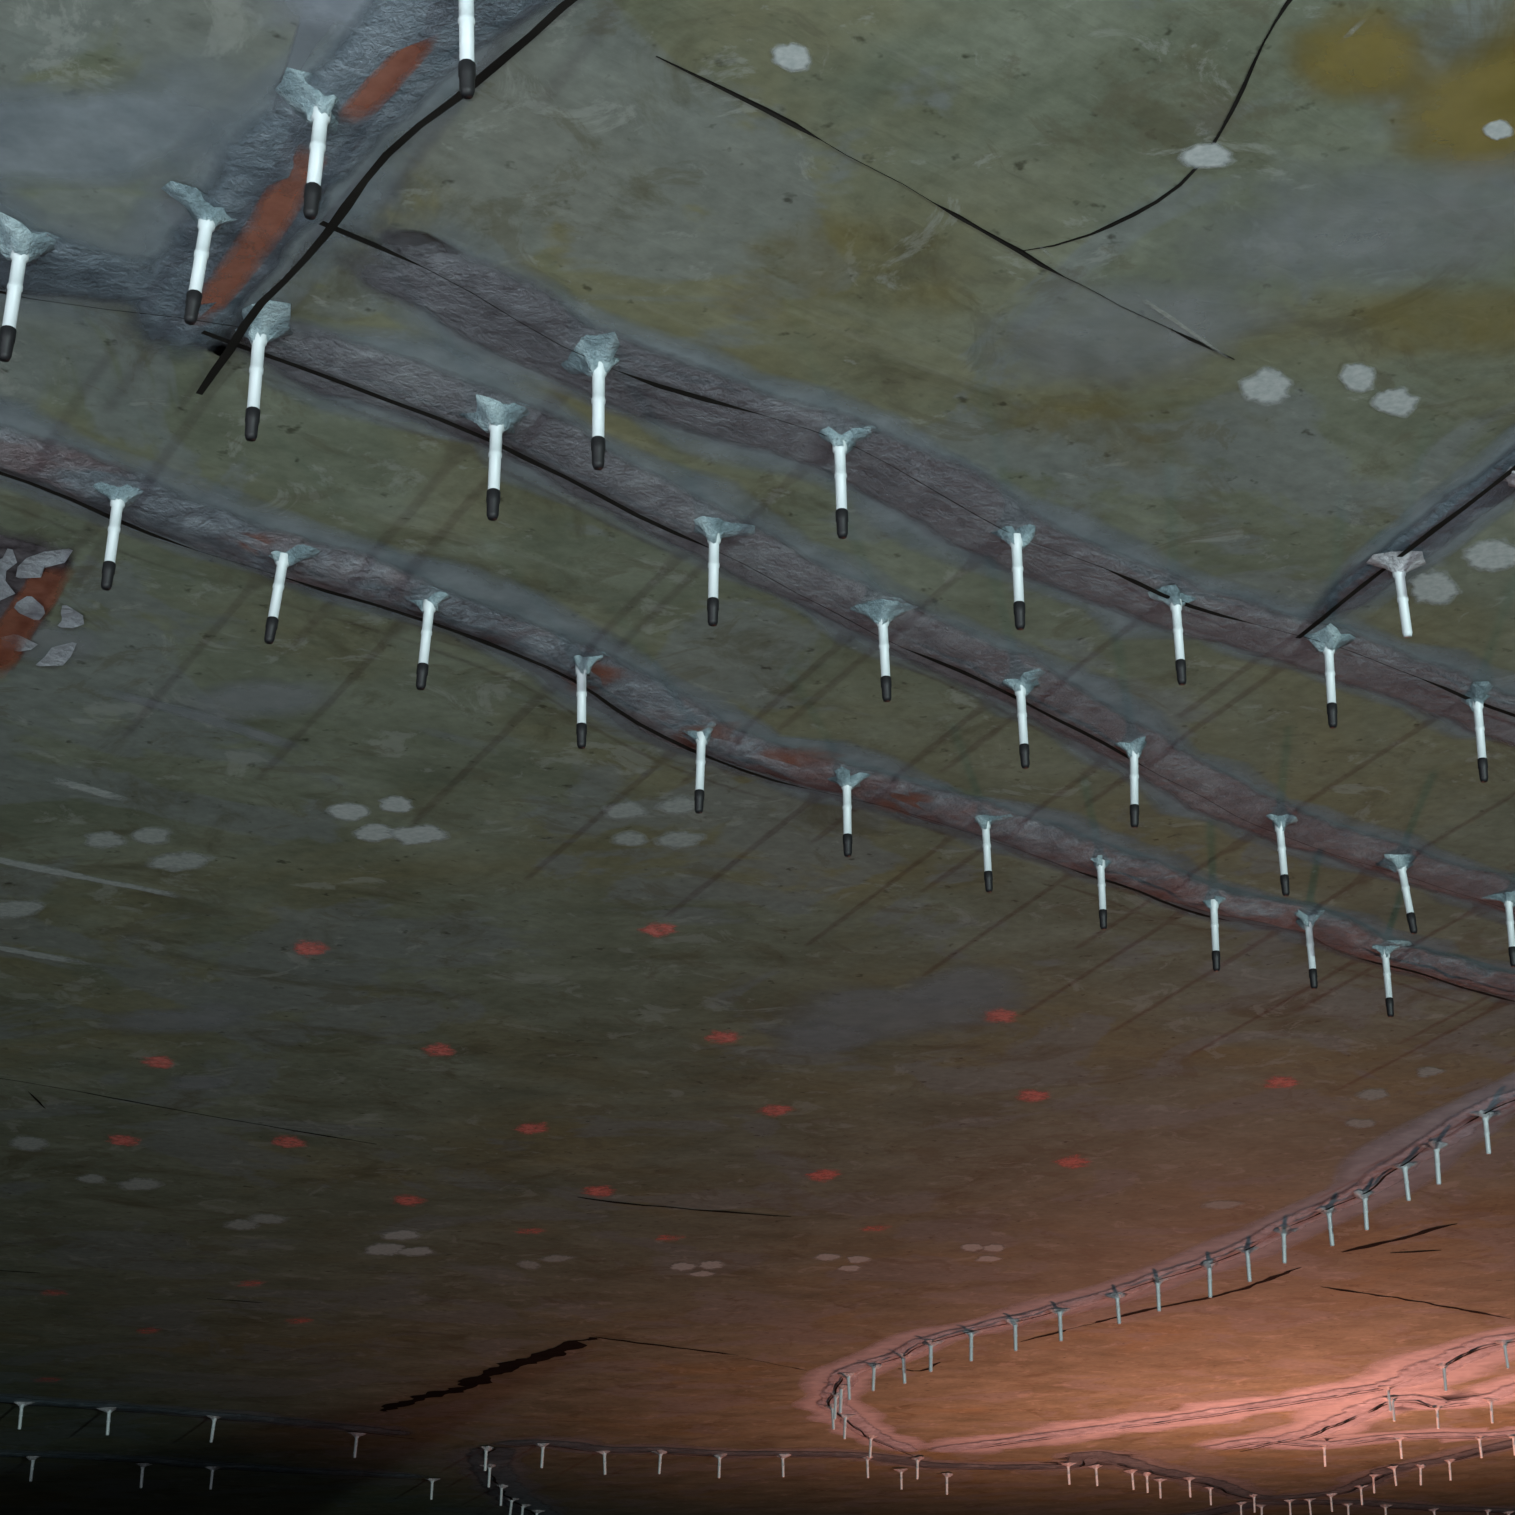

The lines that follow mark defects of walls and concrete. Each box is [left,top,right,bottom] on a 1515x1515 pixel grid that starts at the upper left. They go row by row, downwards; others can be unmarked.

leakage [1303,18,1515,171]
peeling [0,534,84,666]
crack [0,0,1515,1002]
crack [0,1074,1515,1515]